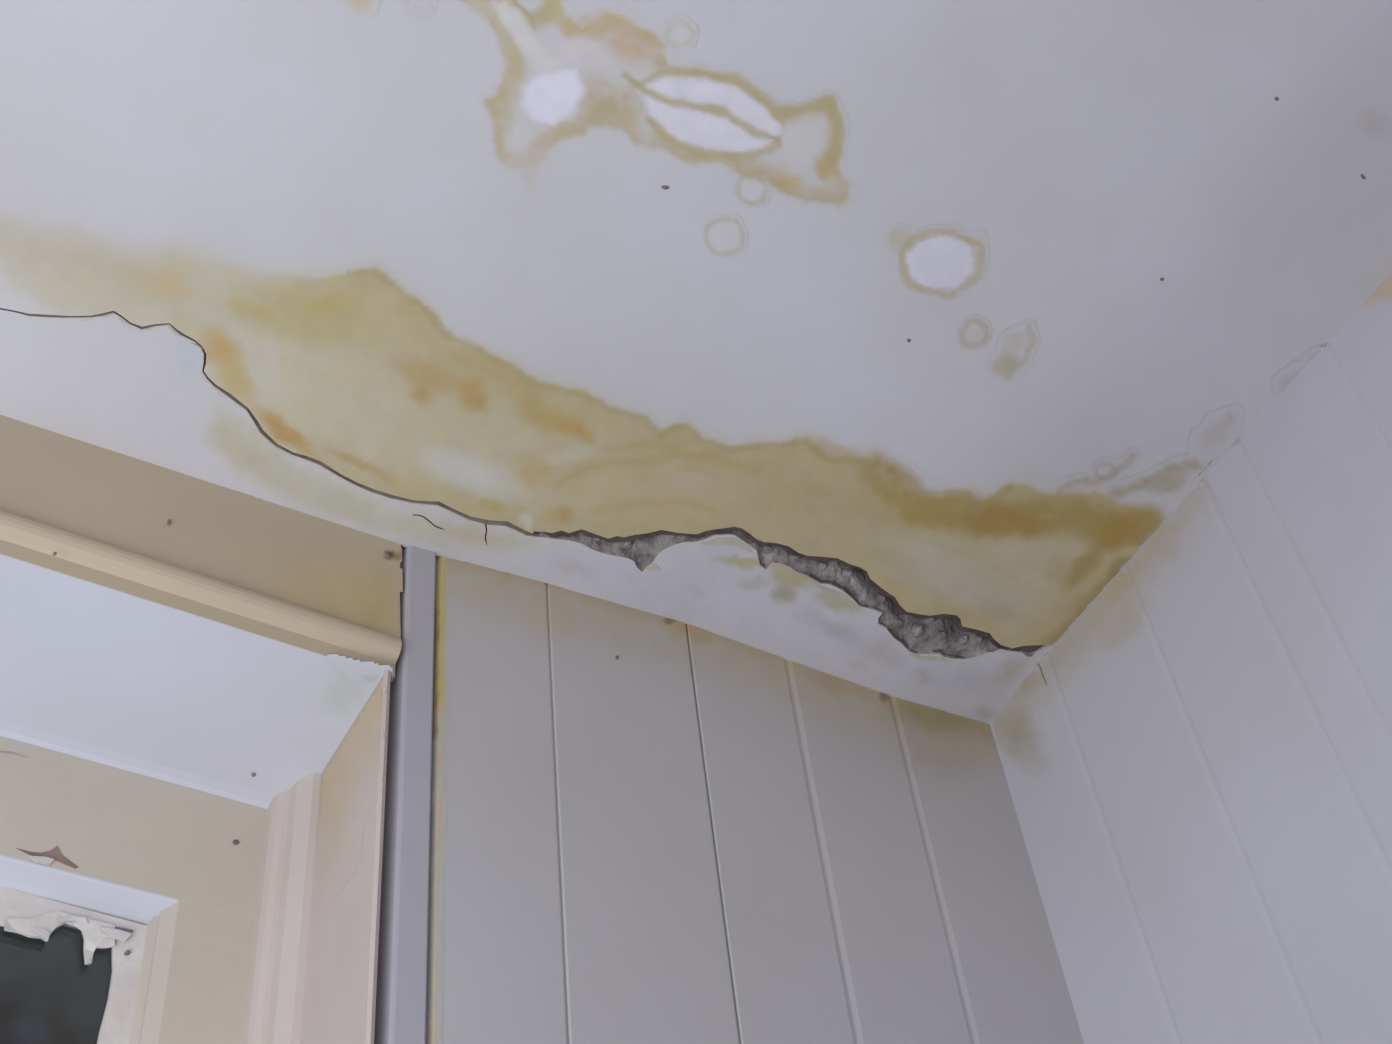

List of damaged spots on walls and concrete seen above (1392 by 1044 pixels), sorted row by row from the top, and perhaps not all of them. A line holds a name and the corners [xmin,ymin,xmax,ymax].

damp [399,0,857,261]
crack [0,308,538,544]
damp [0,203,1244,1044]
spalling [534,527,1045,661]
peeling [4,911,134,965]